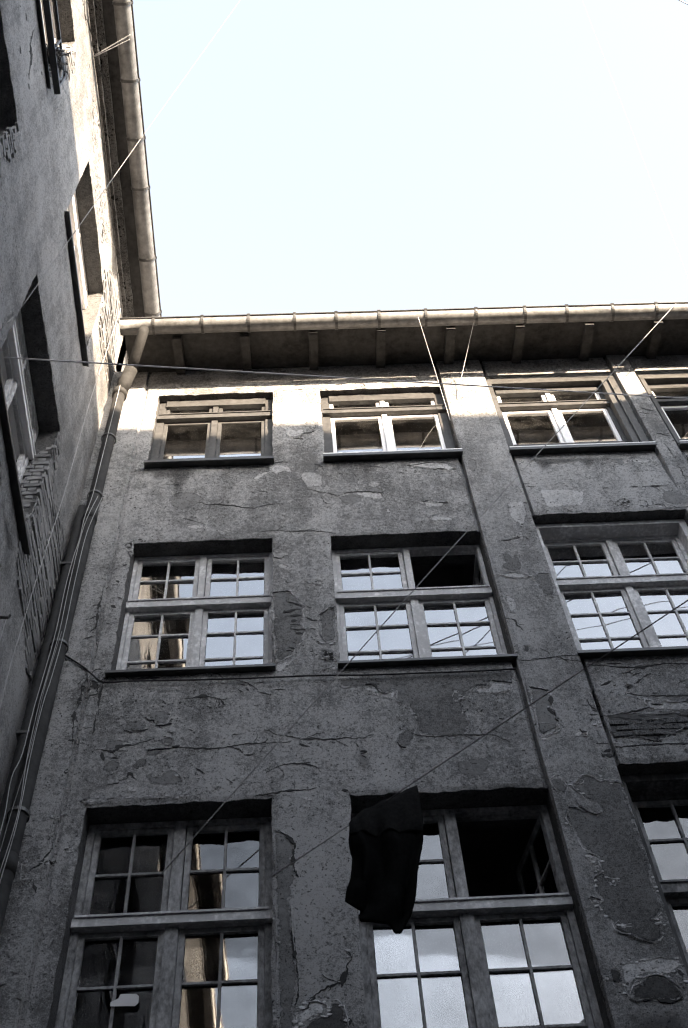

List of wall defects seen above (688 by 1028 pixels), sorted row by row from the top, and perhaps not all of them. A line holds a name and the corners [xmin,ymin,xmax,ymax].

spalling [270,589,339,675]
crack [64,564,374,796]
crack [408,730,510,764]
flaking render [452,681,513,702]
flaking render [527,686,688,758]
flaking render [549,774,623,815]
spalling [272,829,350,1028]
spalling [599,956,688,1004]